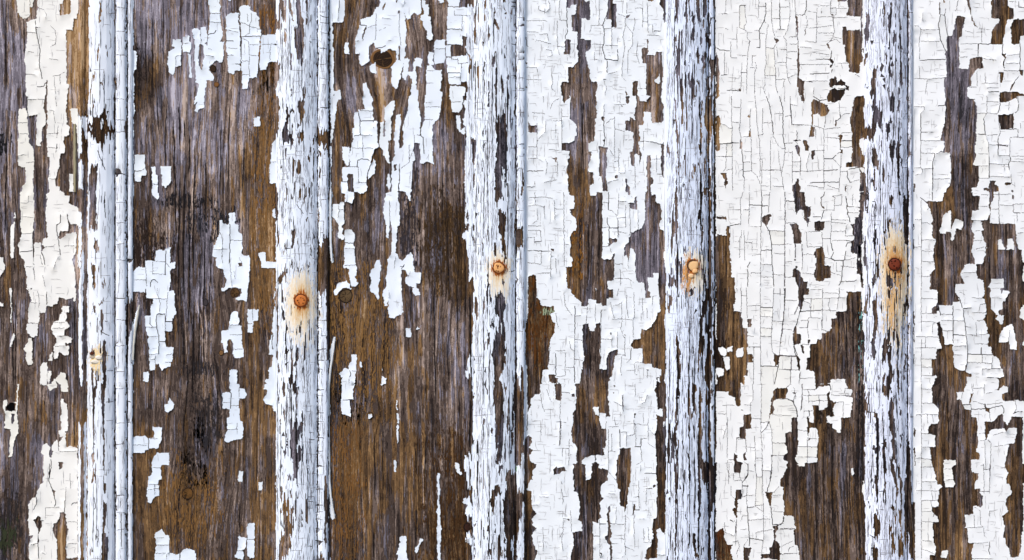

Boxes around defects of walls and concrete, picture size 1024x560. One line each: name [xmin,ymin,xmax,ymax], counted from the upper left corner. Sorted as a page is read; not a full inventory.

corrosion [281,261,323,357]
peeling [0,0,636,560]
corrosion [484,246,515,303]
corrosion [676,242,708,303]
crack [389,0,1024,560]
peeling [553,0,1024,560]
corrosion [876,211,912,371]